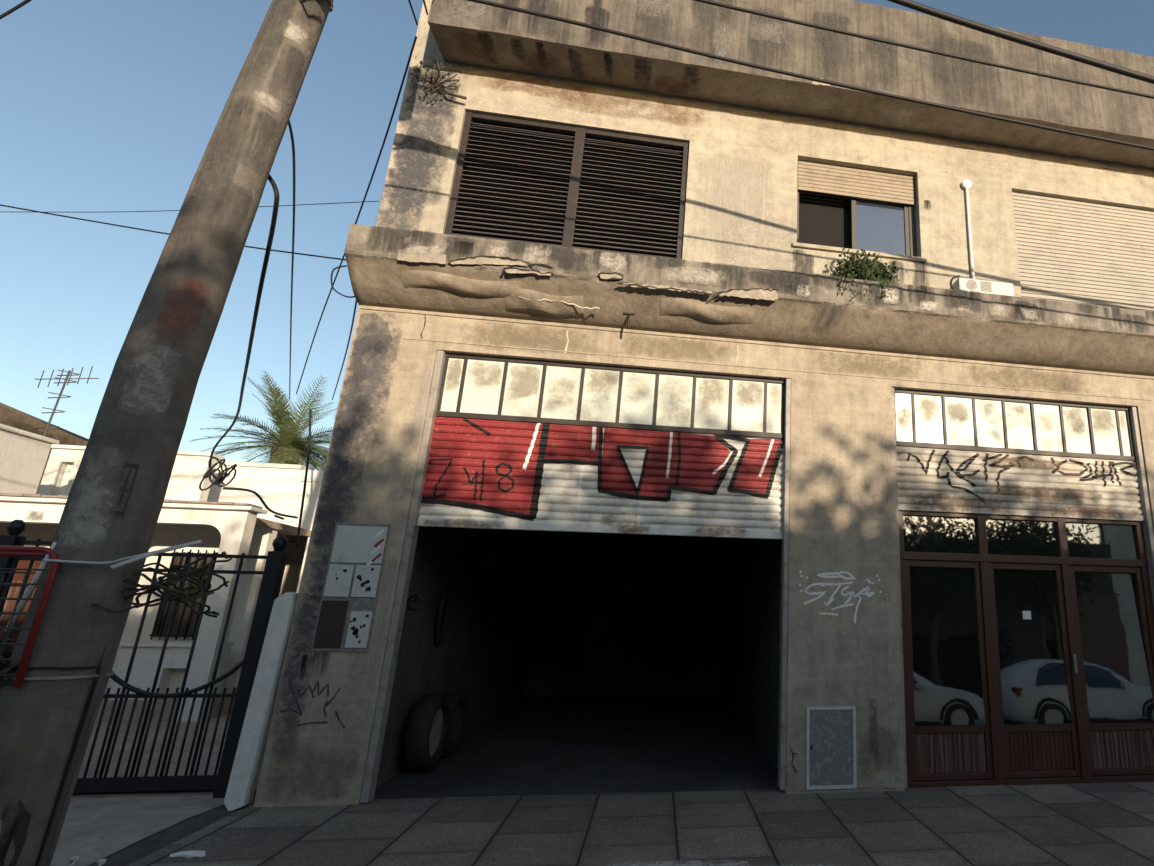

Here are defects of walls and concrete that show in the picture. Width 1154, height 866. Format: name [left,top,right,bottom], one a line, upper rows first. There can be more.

water stain [586,0,609,41]
water stain [618,105,659,115]
water stain [373,65,474,257]
water stain [491,162,841,295]
spalling [397,248,551,276]
spalling [600,274,778,301]
water stain [858,261,981,312]
water stain [992,296,1046,320]
water stain [1063,303,1154,329]
water stain [271,325,398,797]